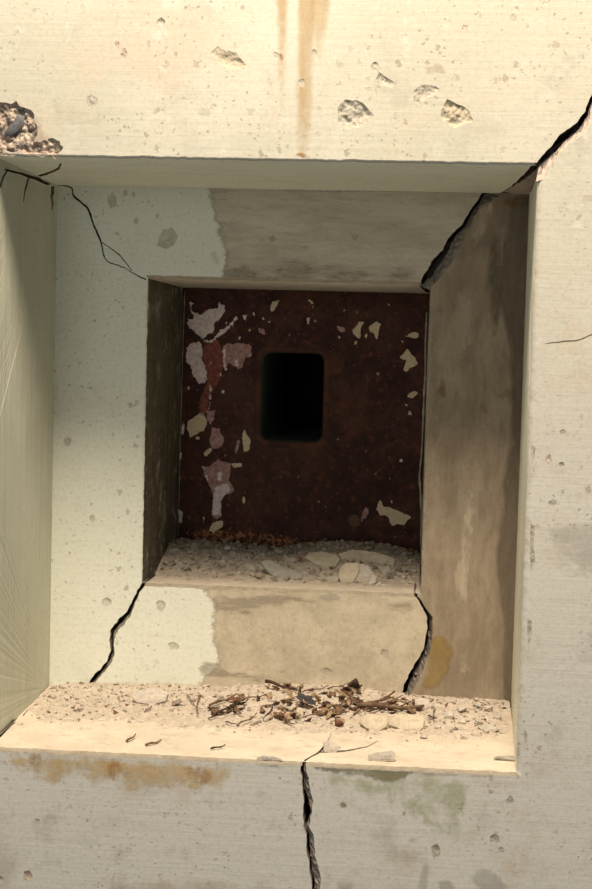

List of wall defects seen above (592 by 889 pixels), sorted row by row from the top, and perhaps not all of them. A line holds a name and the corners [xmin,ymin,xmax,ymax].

spalling [0,101,63,159]
crack [0,163,146,280]
crack [419,95,592,292]
peeling [181,298,279,533]
crack [89,573,156,683]
crack [404,582,433,695]
crack [0,710,28,737]
crack [300,736,378,889]